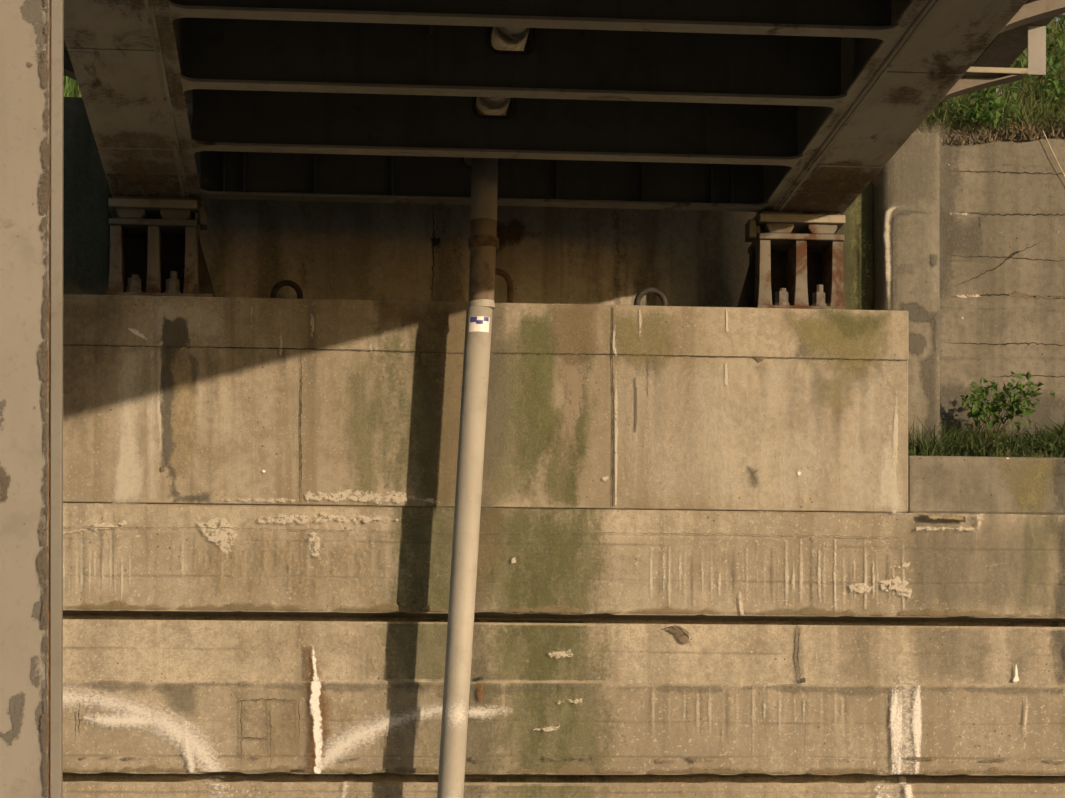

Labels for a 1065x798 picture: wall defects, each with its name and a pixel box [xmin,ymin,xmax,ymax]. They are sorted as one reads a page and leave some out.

peeling [20,0,46,64]
crack [950,168,1063,176]
rust [496,220,525,249]
rust [774,181,865,212]
crack [956,212,1065,227]
crack [947,241,1064,287]
damp [792,311,887,407]
damp [488,318,588,505]
damp [174,335,444,560]
peeling [0,467,11,502]
peeling [32,601,43,621]
peeling [0,656,44,746]